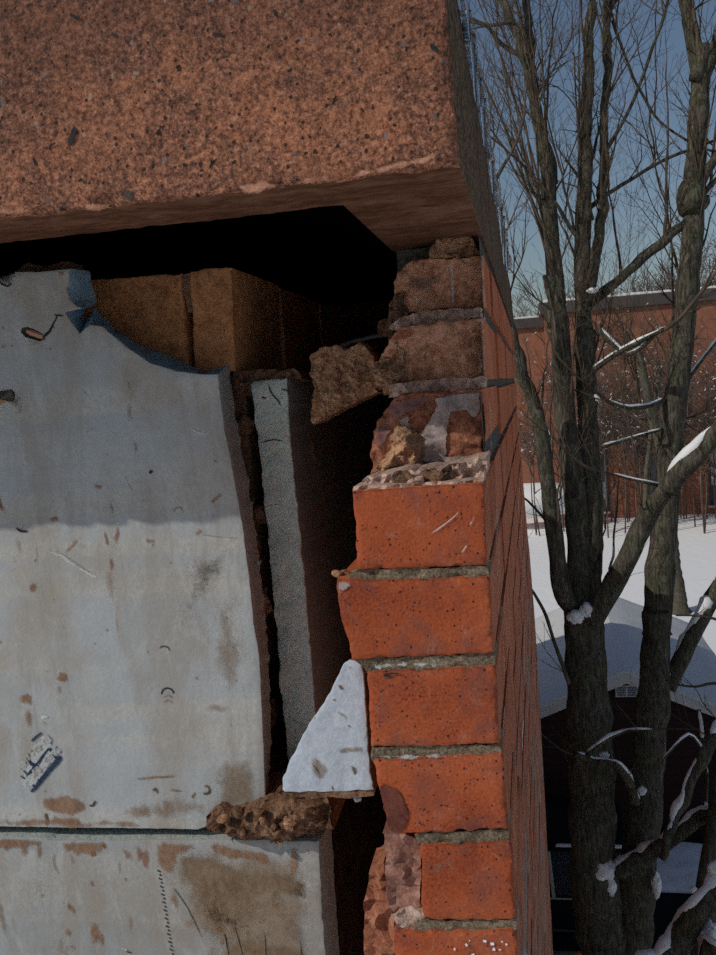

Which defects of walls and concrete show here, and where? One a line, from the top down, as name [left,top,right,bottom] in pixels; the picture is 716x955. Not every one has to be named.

corrosion [20,694,47,724]
corrosion [5,796,132,828]
corrosion [0,839,40,858]
corrosion [65,843,106,856]
corrosion [124,844,188,872]
corrosion [212,845,267,863]